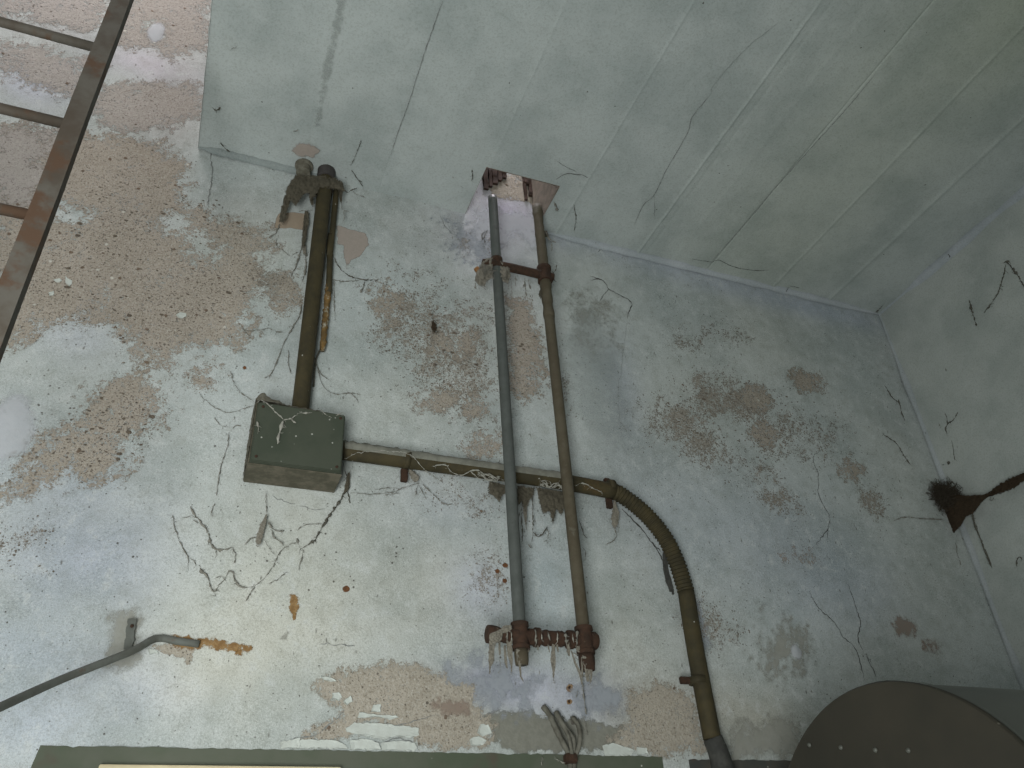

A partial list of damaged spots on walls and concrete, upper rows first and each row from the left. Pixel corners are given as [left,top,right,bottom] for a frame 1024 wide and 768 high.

spalling [0,36,88,99]
spalling [117,0,211,65]
crack [391,1,443,154]
crack [636,24,776,220]
spalling [0,78,305,509]
spalling [351,256,551,461]
spalling [625,362,888,523]
rust [173,634,252,655]
rust [289,594,299,620]
crack [809,585,876,680]
peeling [280,658,499,752]
peeling [602,678,707,759]